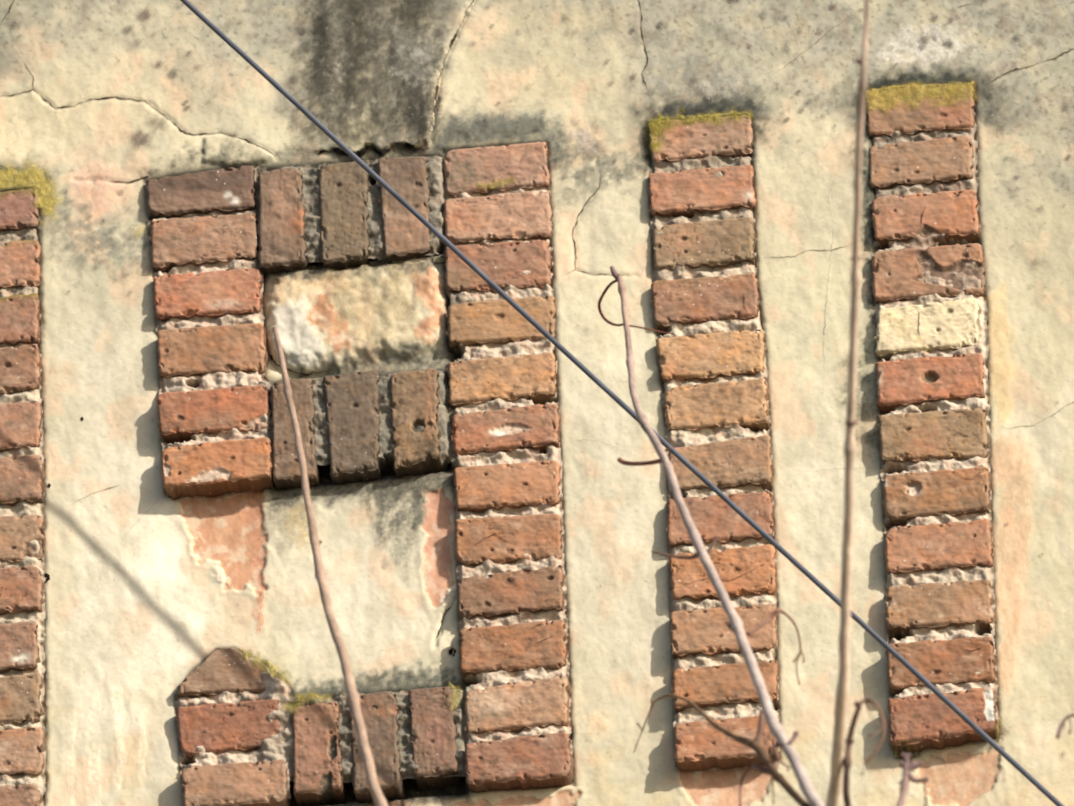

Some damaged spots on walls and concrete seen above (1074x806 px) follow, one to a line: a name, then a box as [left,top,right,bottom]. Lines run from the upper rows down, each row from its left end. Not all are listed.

crack [0,50,274,156]
damp [289,0,461,163]
crack [431,0,474,140]
crack [638,0,648,91]
crack [106,175,149,183]
crack [569,185,626,276]
spalling [191,468,230,480]
peeling [173,491,267,632]
peeling [422,490,455,608]
peeling [455,790,581,806]
peeling [679,765,771,806]
peeling [915,750,1000,806]